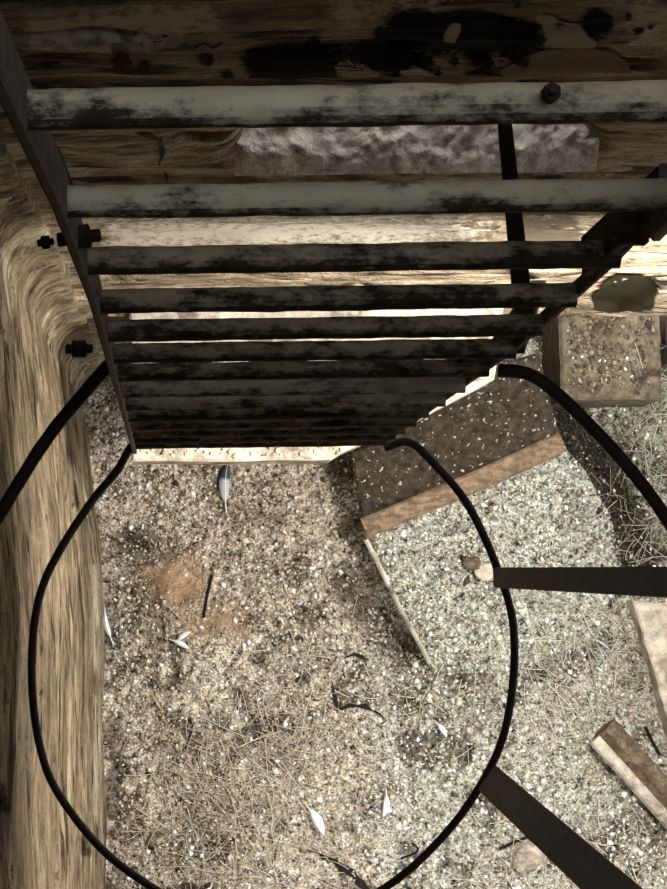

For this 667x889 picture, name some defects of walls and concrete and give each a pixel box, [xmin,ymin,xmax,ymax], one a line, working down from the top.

damp [222,1,563,80]
damp [580,7,615,42]